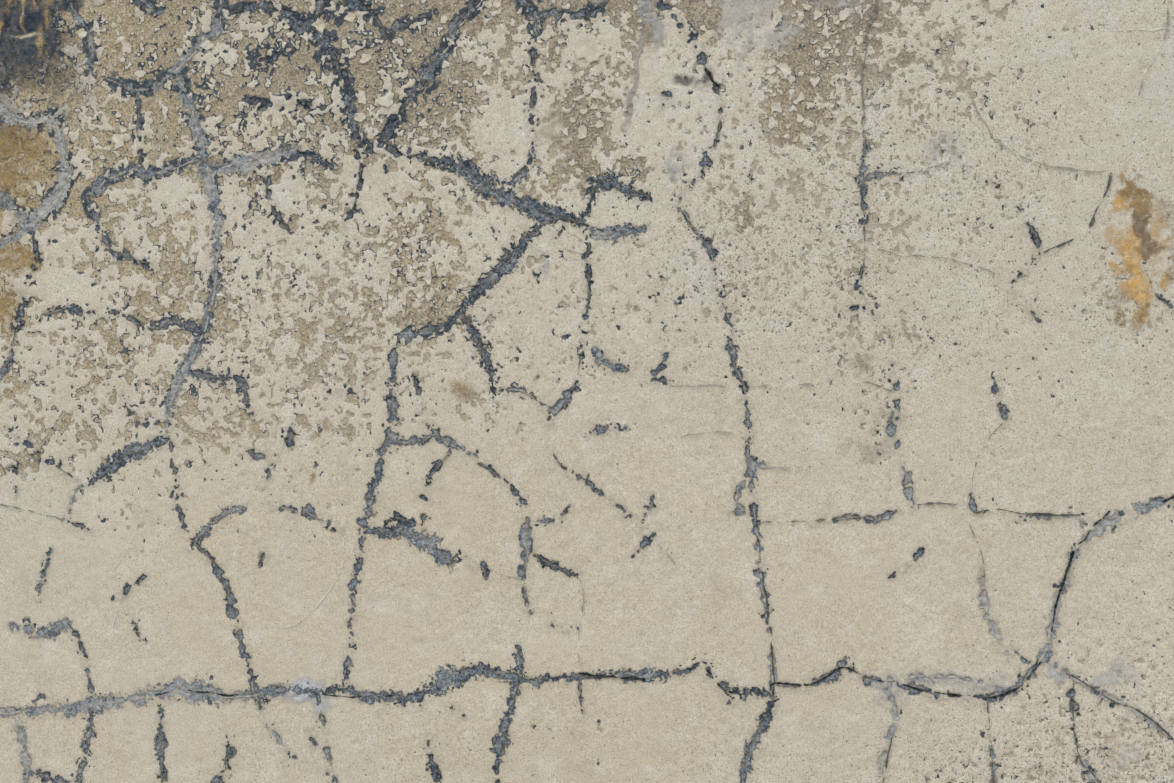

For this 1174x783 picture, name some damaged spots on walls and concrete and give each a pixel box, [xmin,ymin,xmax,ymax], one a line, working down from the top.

crack [1138,8,1169,96]
crack [662,4,724,279]
crack [849,0,1112,315]
crack [0,0,653,622]
crack [718,294,732,327]
peeling [1048,241,1173,347]
corrosion [1108,181,1169,322]
crack [1145,270,1173,308]
peeling [441,549,473,575]
crack [0,339,1174,783]
peeling [644,653,779,733]